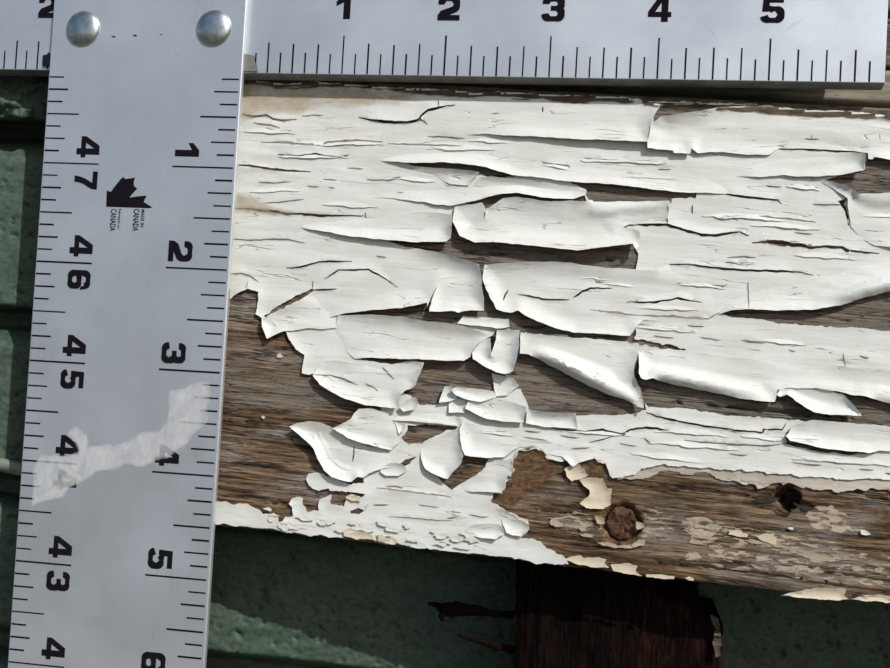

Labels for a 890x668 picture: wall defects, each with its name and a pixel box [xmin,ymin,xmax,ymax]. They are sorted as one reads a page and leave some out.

peeling [262,103,890,493]
peeling [263,507,313,531]
peeling [335,520,398,545]
peeling [409,507,529,550]
rust [595,501,644,545]
peeling [611,563,675,579]
peeling [714,549,751,572]
peeling [776,565,824,575]
peeling [853,594,890,603]